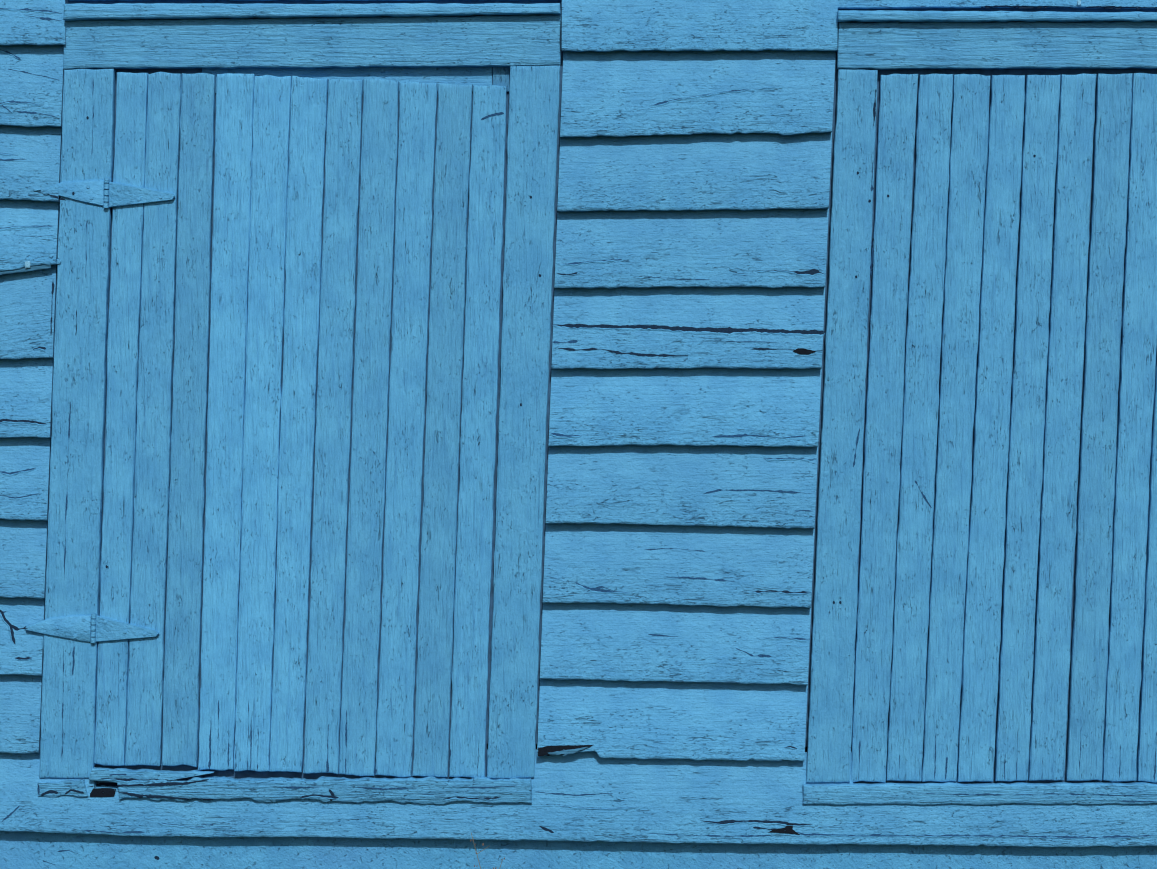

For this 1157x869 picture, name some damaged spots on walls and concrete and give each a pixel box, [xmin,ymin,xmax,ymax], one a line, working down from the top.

crack [553,324,825,357]
crack [0,610,32,661]
crack [61,647,75,756]
spalling [538,745,593,756]